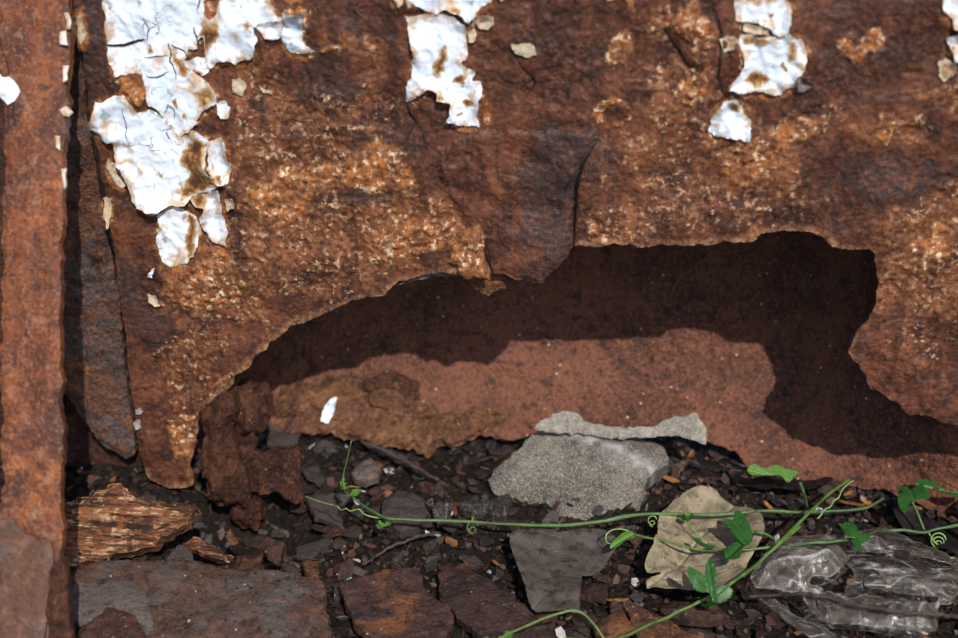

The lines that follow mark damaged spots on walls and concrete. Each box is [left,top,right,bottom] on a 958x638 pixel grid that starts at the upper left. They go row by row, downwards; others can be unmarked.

corrosion [650,0,712,44]
peeling [705,0,815,146]
corrosion [837,27,887,63]
peeling [937,0,958,82]
peeling [88,0,315,278]
corrosion [246,135,419,231]
peeling [390,0,600,283]
corrosion [364,210,514,296]
corrosion [166,414,197,461]
peeling [321,397,337,424]
corrosion [272,369,506,458]
peeling [534,411,707,444]